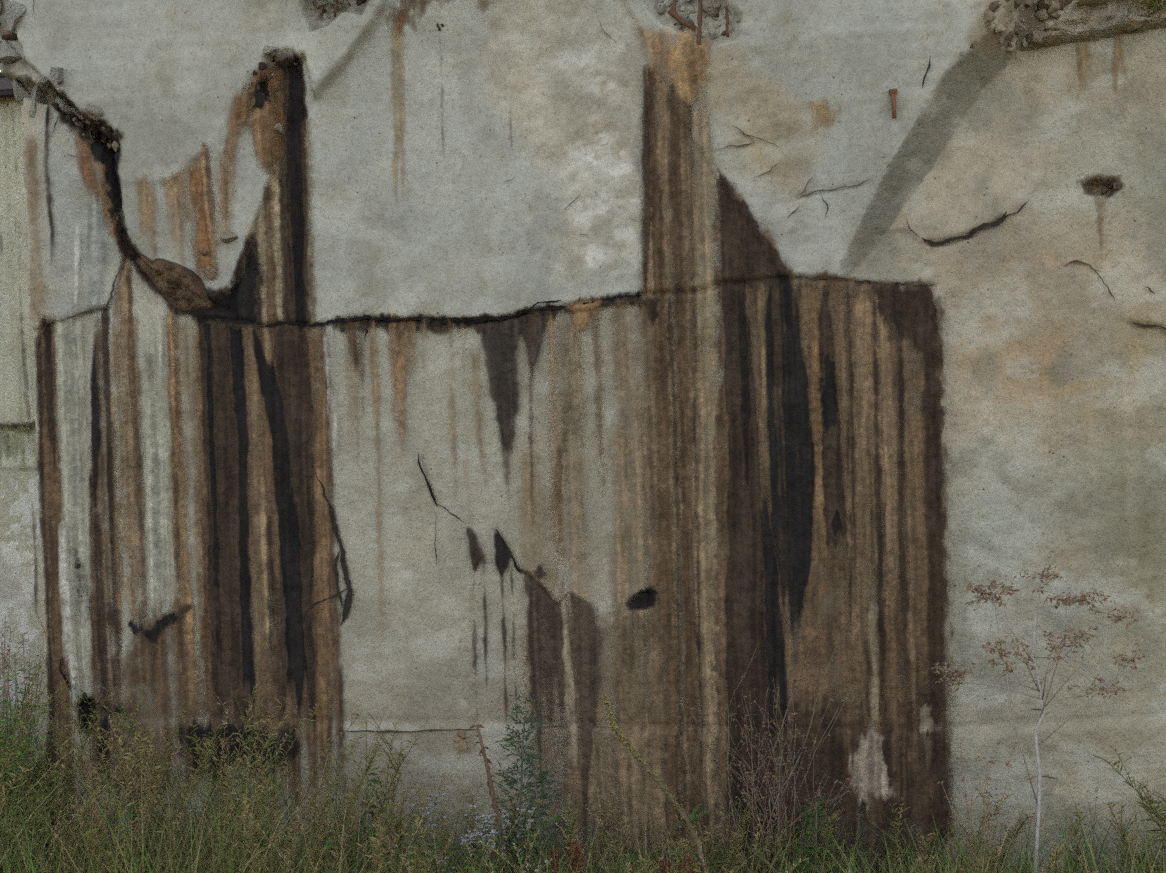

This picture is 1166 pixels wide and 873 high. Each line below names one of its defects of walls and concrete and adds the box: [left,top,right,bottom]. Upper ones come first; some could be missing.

spalling [0,0,27,64]
spalling [657,0,741,39]
spalling [13,67,119,153]
crack [906,201,1028,246]
crack [35,257,125,352]
crack [1064,260,1166,330]
damp [22,342,30,419]
damp [26,88,642,837]
crack [418,454,464,565]
crack [496,529,536,574]
damp [712,171,956,873]